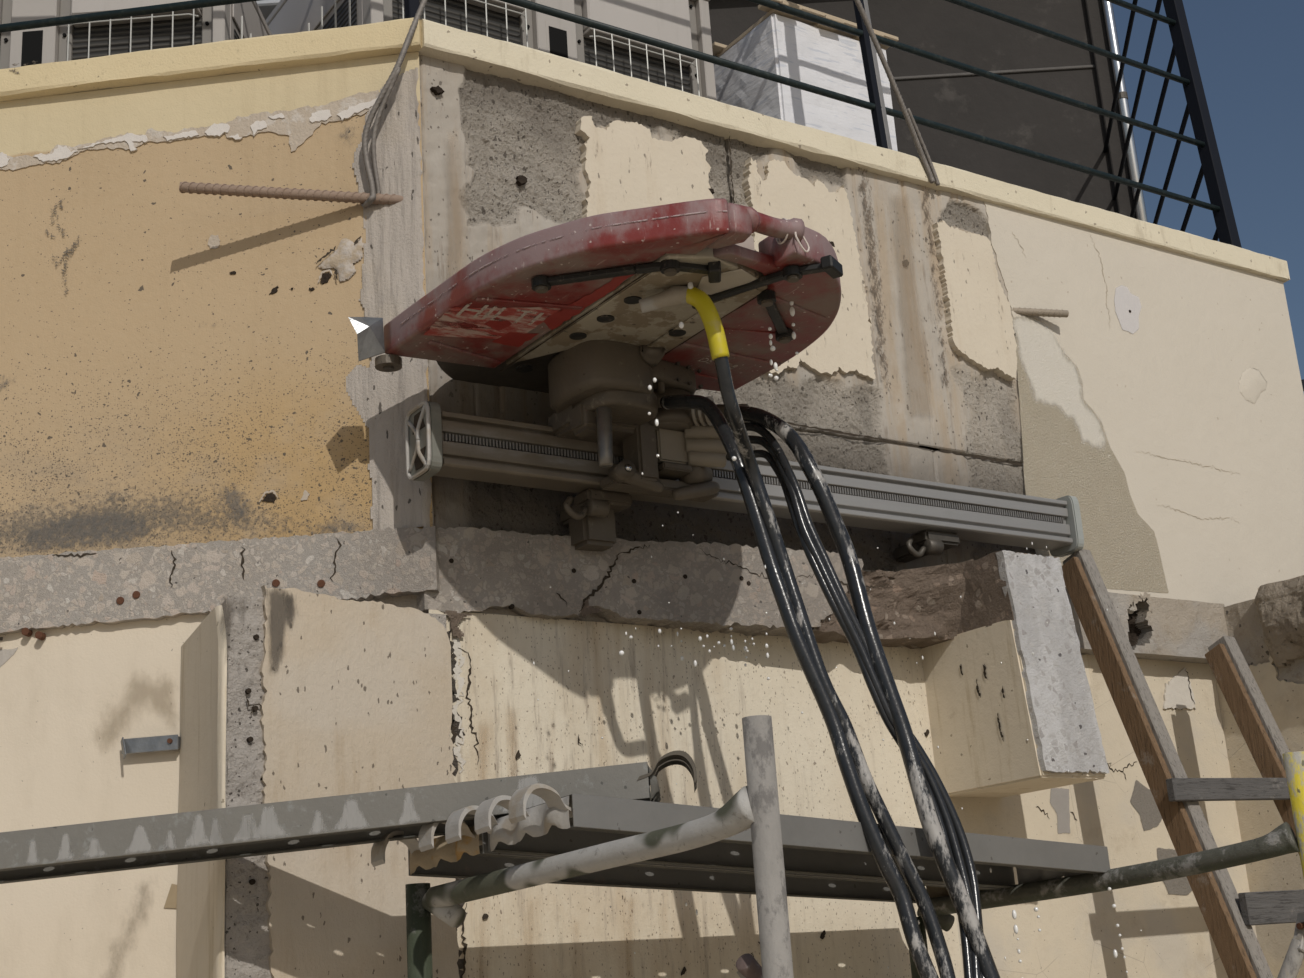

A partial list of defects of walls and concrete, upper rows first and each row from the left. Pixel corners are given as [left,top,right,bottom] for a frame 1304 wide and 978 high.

spalling [0,55,1069,495]
spalling [346,353,579,536]
crack [168,550,176,587]
crack [238,547,246,579]
crack [330,539,342,580]
crack [557,544,650,612]
spalling [615,500,758,548]
spalling [776,517,803,551]
spalling [813,522,838,553]
crack [447,630,479,776]
crack [455,878,468,978]